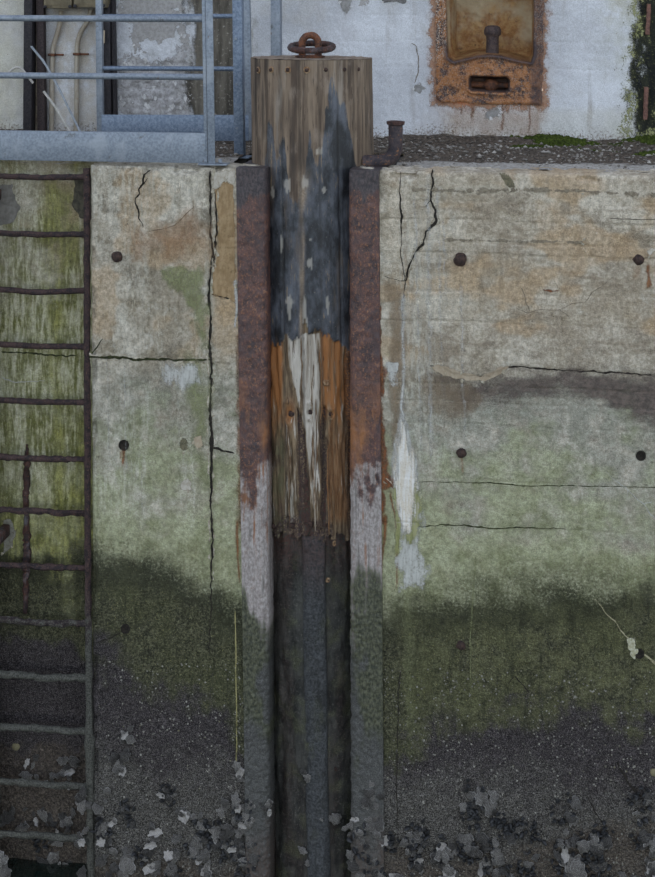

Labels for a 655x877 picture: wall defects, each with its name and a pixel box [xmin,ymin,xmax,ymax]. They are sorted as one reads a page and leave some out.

leakage [182,0,234,115]
peeling [338,0,369,15]
rust [426,0,550,124]
leakage [614,0,655,138]
crack [385,169,440,327]
crack [1,170,234,653]
rust [380,306,397,560]
leakage [387,285,428,588]
leakage [424,369,655,432]
crack [508,366,651,376]
crack [418,522,564,530]
leakage [627,638,638,659]